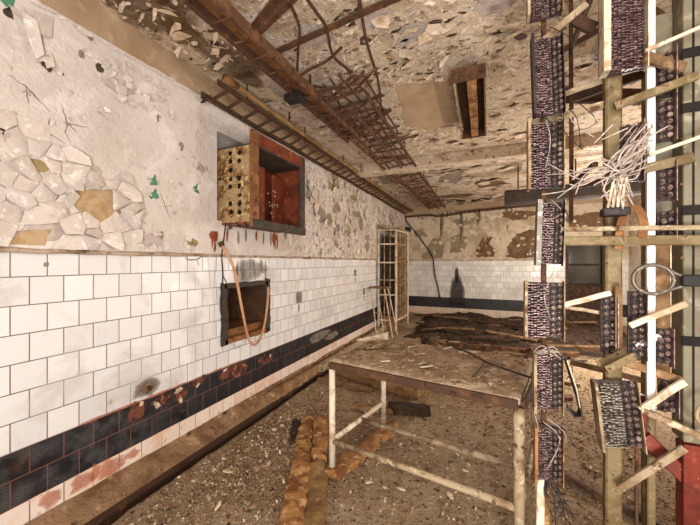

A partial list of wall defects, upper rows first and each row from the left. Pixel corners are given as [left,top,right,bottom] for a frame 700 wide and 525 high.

peeling [0,0,247,123]
peeling [272,0,574,155]
crack [7,74,82,144]
peeling [0,109,182,252]
peeling [377,160,526,207]
corrosion [209,228,229,251]
corrosion [238,230,278,249]
peeling [411,216,535,260]
water stain [236,261,266,281]
spalling [127,375,209,423]
corrosion [72,449,139,493]
corrosion [40,491,60,508]